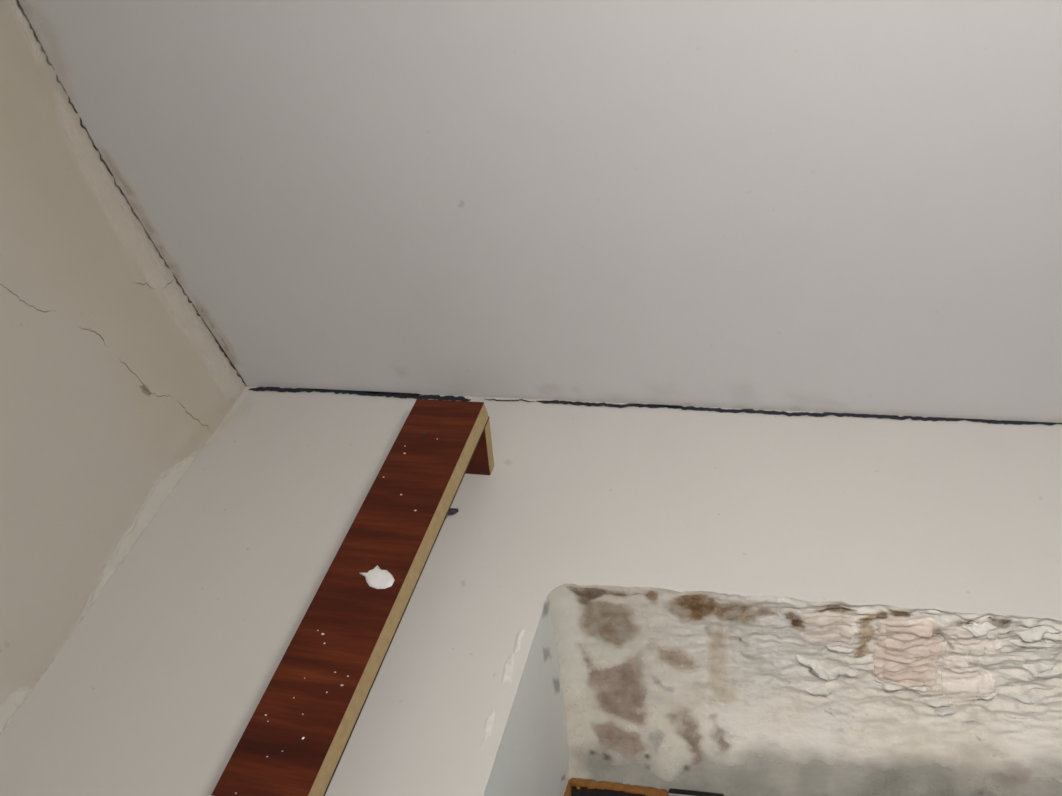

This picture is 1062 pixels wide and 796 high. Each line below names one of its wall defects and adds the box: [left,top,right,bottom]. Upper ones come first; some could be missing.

crack [16,0,1062,425]
spalling [571,588,657,644]
spalling [672,594,754,620]
spalling [786,612,805,629]
spalling [817,605,854,613]
spalling [660,651,692,669]
spalling [586,659,644,757]
spalling [682,721,701,763]
damp [588,751,1062,796]